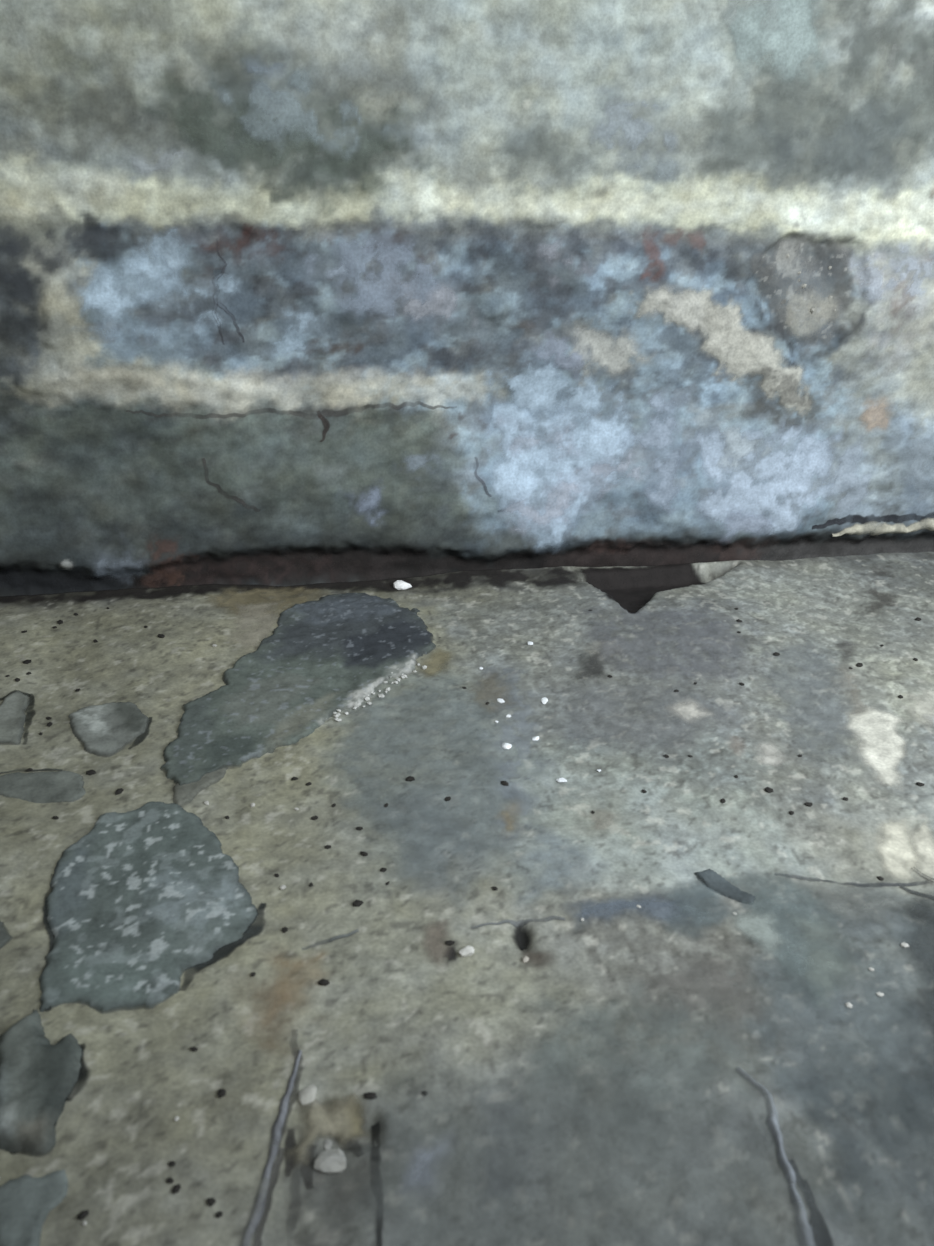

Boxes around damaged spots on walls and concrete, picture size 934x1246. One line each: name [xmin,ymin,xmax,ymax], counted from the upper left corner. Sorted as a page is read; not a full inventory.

leakage [0,217,203,319]
leakage [328,238,456,320]
spalling [752,235,852,353]
crack [319,414,329,442]
crack [478,478,504,512]
leakage [490,327,679,548]
leakage [697,422,870,535]
crack [0,514,934,614]
peeling [0,593,448,1155]
peeling [0,1169,68,1246]
spalling [285,1085,366,1207]
crack [767,1108,833,1246]